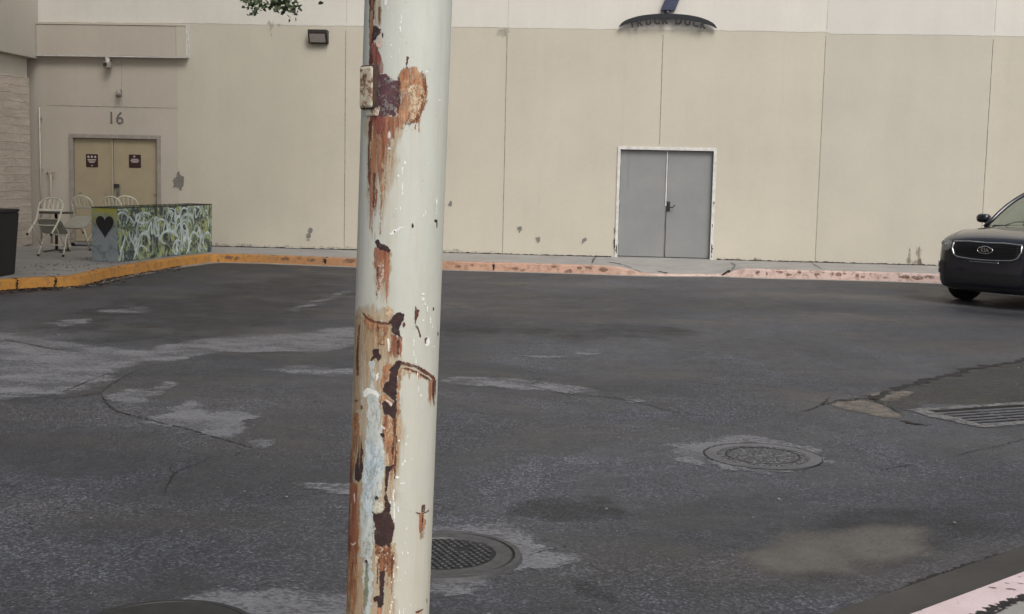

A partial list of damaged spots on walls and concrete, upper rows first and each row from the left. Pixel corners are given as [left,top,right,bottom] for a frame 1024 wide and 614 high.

crack [63,371,255,494]
rust [346,0,428,614]
peeling [349,292,435,614]
crack [804,357,1024,425]